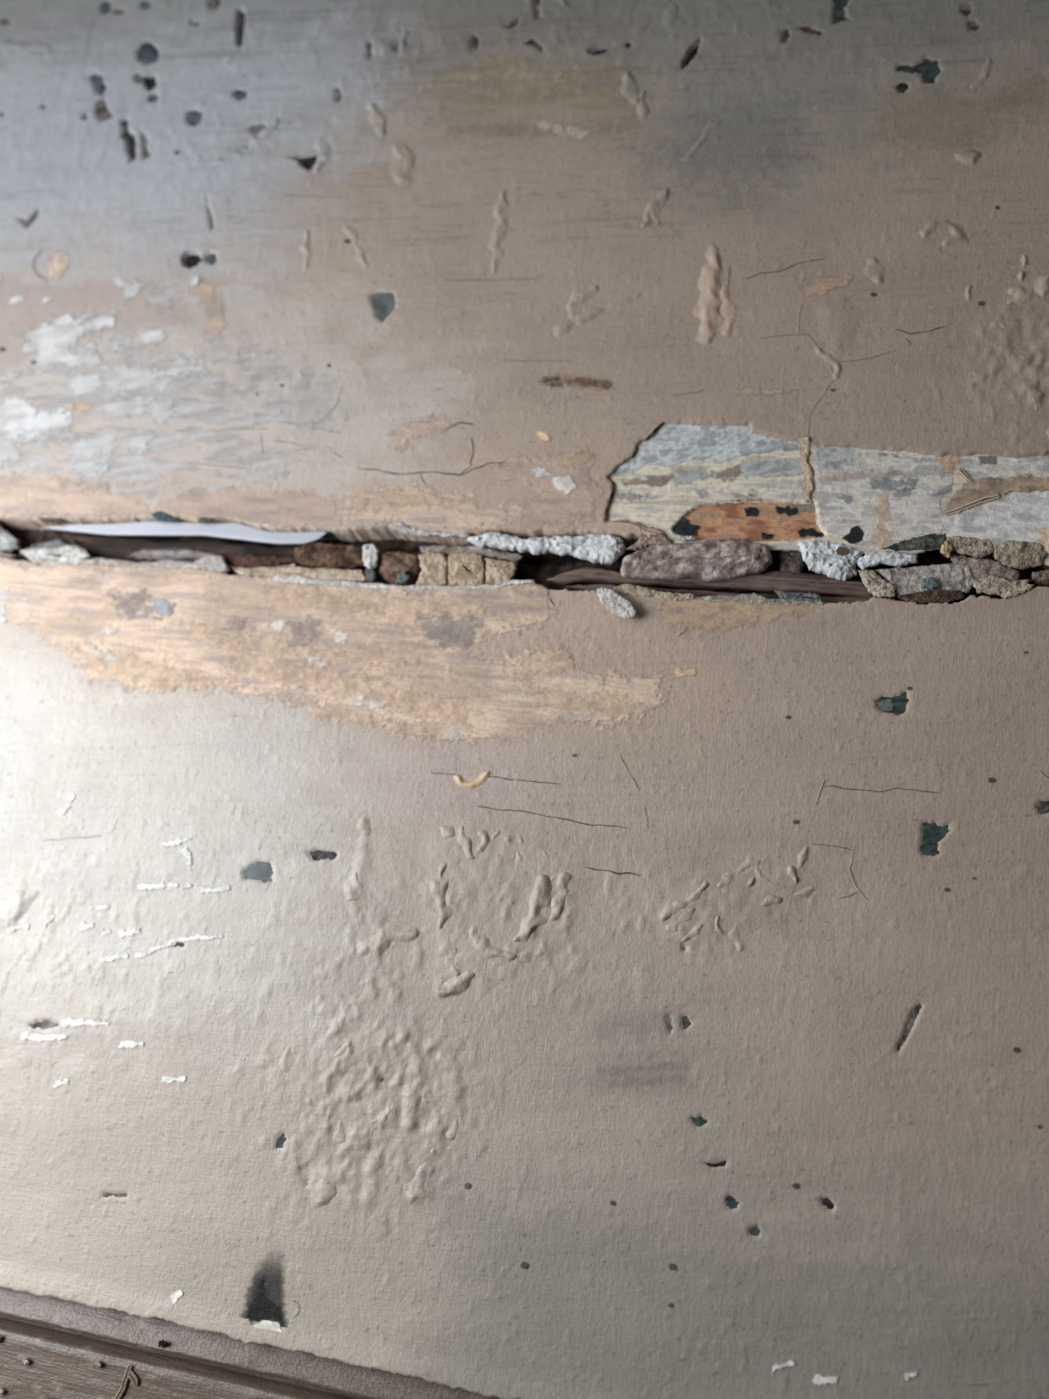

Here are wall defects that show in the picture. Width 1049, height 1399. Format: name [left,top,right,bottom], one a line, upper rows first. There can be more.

peeling [100,1,151,15]
peeling [207,0,221,10]
peeling [81,74,150,162]
peeling [132,42,159,102]
peeling [186,111,203,127]
peeling [232,90,247,100]
peeling [245,124,266,148]
peeling [370,293,395,322]
peeling [0,250,227,528]
peeling [165,421,1049,565]
crack [0,511,1049,637]
peeling [0,558,696,747]